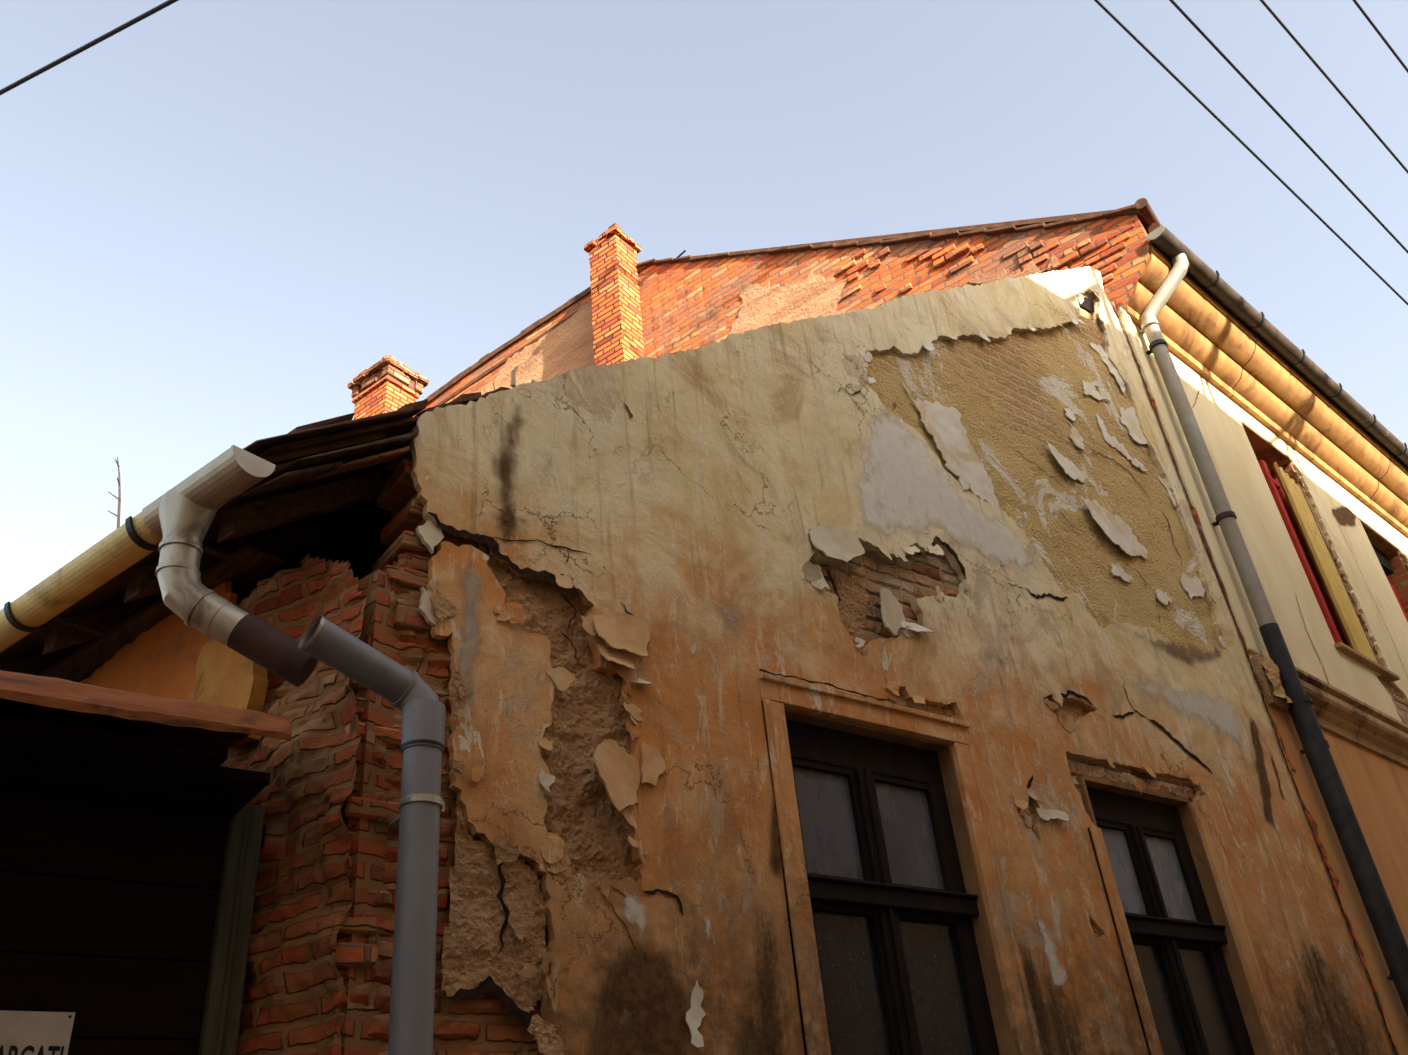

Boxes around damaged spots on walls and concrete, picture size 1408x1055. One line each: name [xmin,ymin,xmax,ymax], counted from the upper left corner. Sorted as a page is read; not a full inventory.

spalling [322,679,403,1055]
spalling [388,519,666,1055]